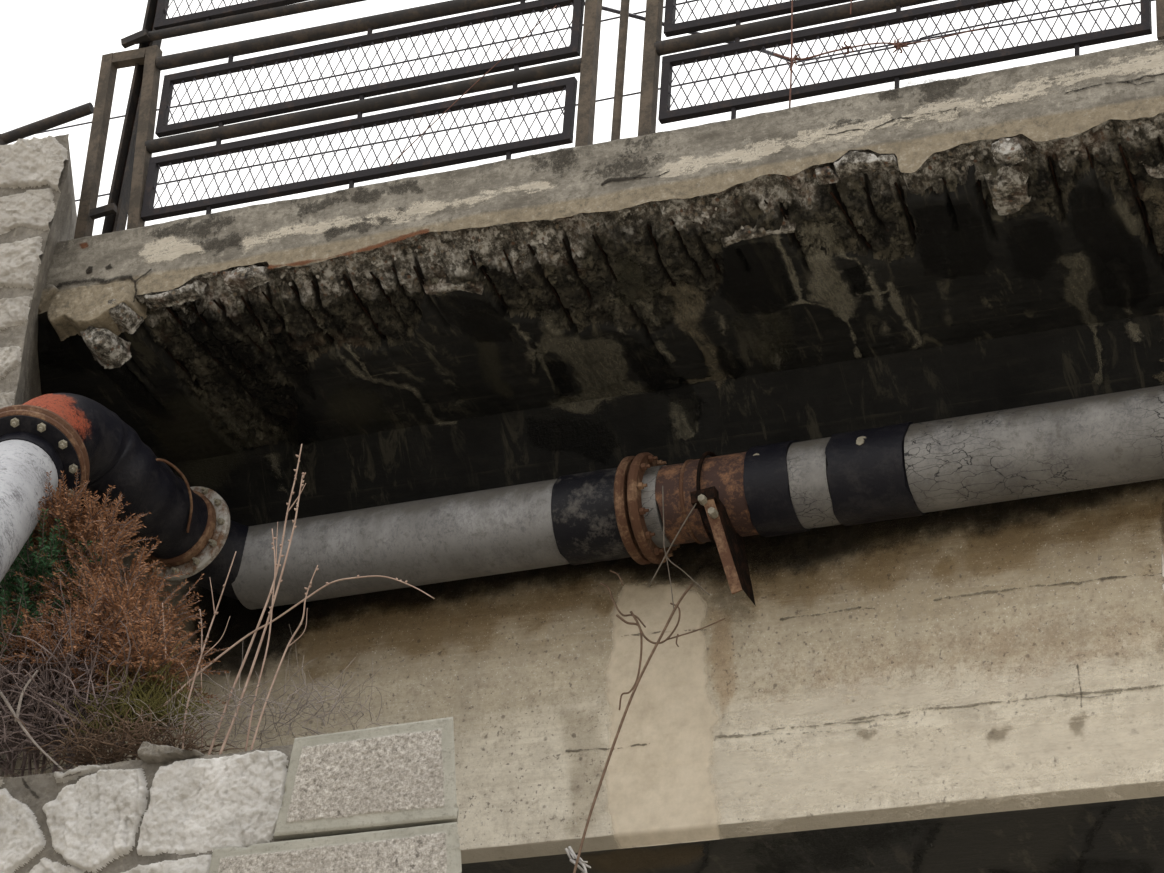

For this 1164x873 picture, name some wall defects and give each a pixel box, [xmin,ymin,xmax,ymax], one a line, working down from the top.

crack [55,269,152,302]
water stain [40,275,318,488]
water stain [326,332,457,426]
spalling [80,112,1164,449]
water stain [432,221,923,463]
water stain [1057,180,1164,384]
water stain [743,478,1164,571]
water stain [184,542,725,848]
crack [716,664,1160,738]